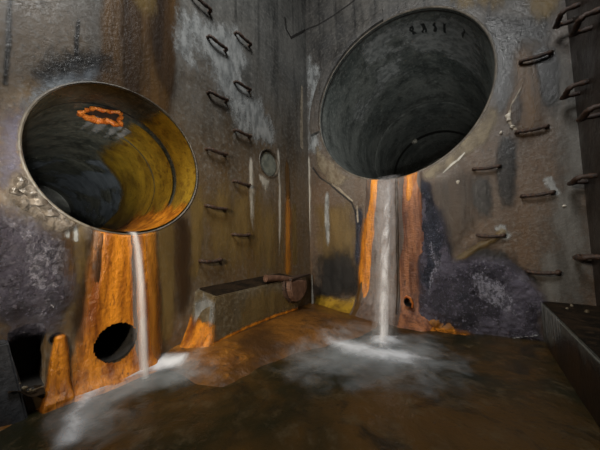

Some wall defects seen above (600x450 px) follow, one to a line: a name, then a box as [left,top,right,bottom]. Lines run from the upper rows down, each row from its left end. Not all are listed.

efflorescence [174,12,274,145]
leakage [395,0,585,344]
leakage [0,210,73,334]
corrosion [62,221,96,332]
corrosion [170,308,297,377]
leakage [315,179,377,316]